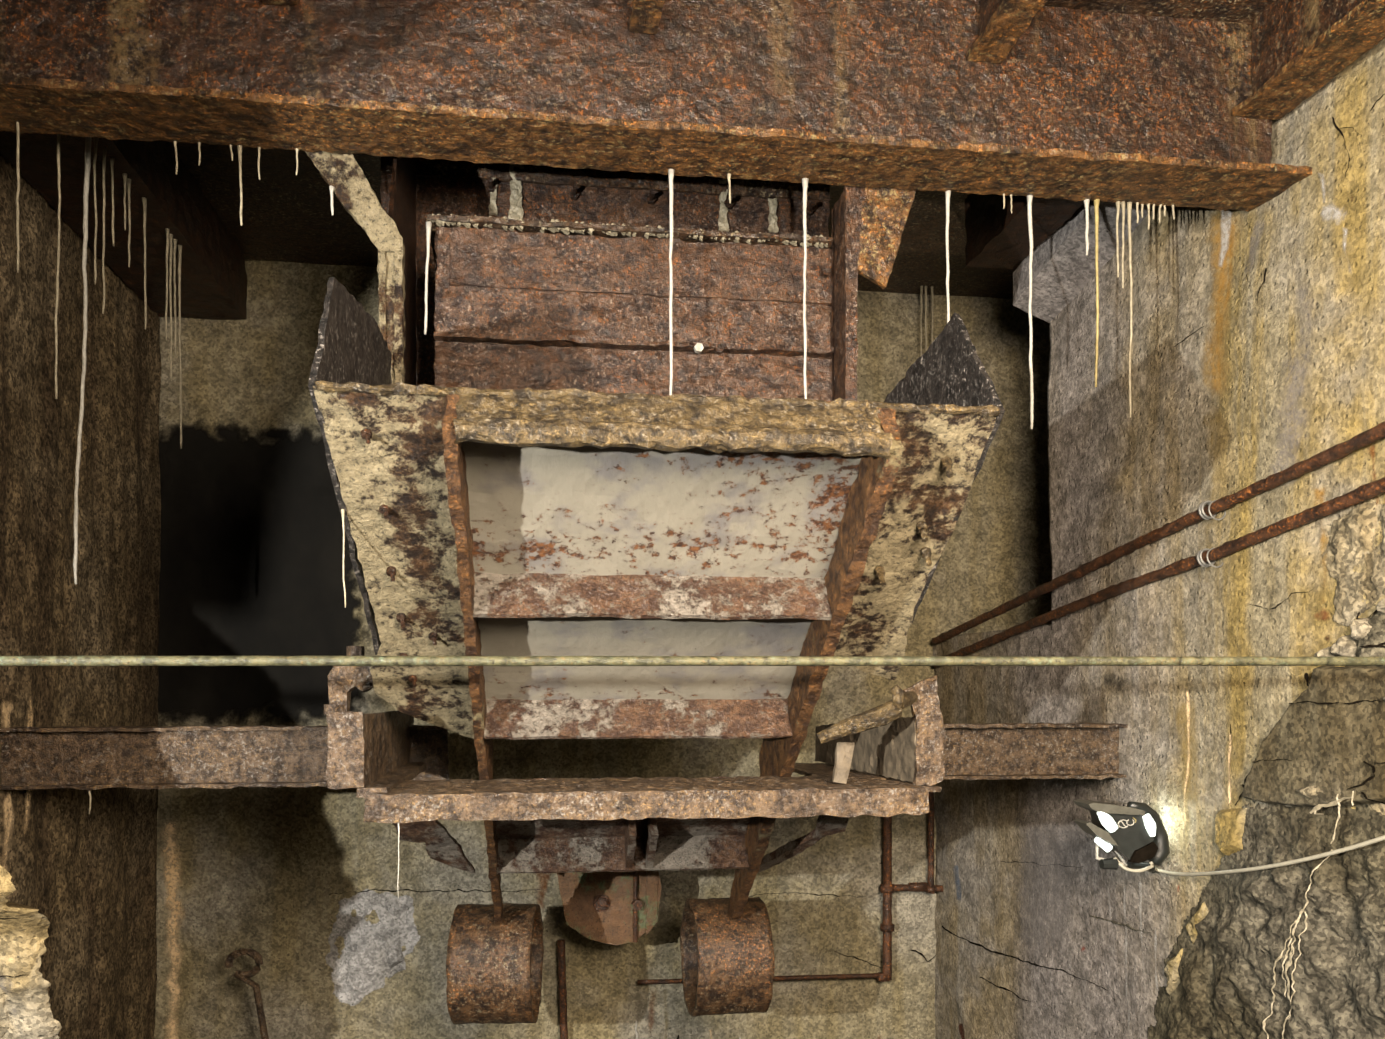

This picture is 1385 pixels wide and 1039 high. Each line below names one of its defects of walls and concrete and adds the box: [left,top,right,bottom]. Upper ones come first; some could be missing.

efflorescence [488,164,524,220]
efflorescence [718,178,729,232]
leakage [768,198,779,233]
crack [1289,673,1384,705]
crack [1228,724,1291,806]
crack [1348,761,1385,804]